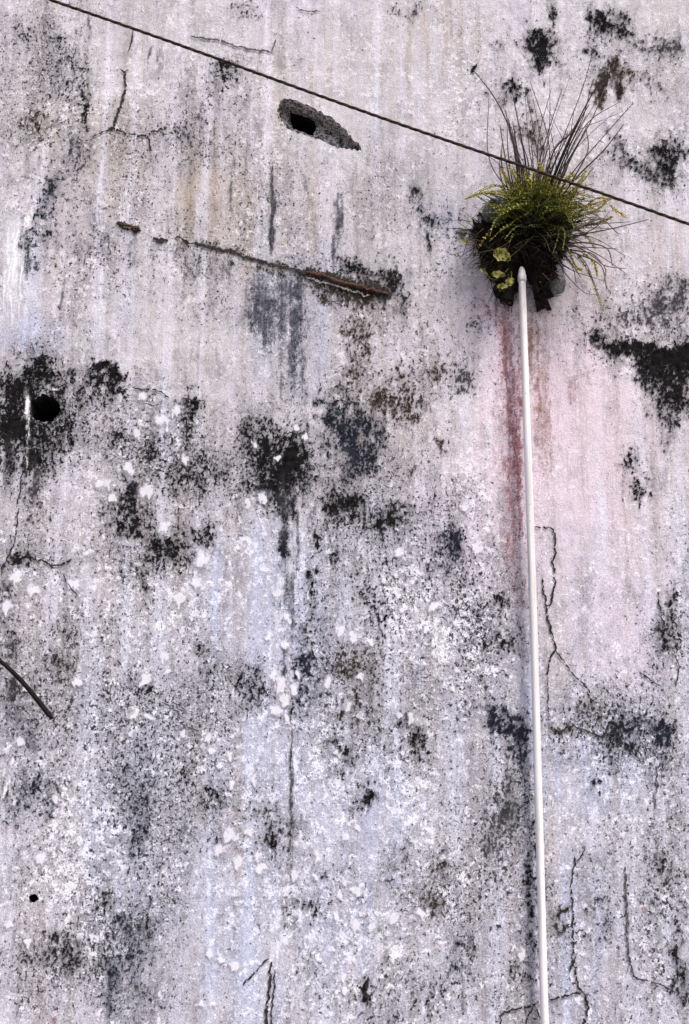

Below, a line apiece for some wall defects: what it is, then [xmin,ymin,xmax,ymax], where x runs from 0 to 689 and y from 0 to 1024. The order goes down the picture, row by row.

crack [92,31,167,151]
damp [582,3,689,198]
damp [0,168,529,867]
rust [306,271,389,296]
rust [486,302,551,564]
damp [583,271,689,456]
crack [536,526,659,809]
crack [639,592,681,687]
damp [550,697,677,828]
crack [499,846,590,1024]
crack [624,867,671,990]
damp [644,843,677,894]